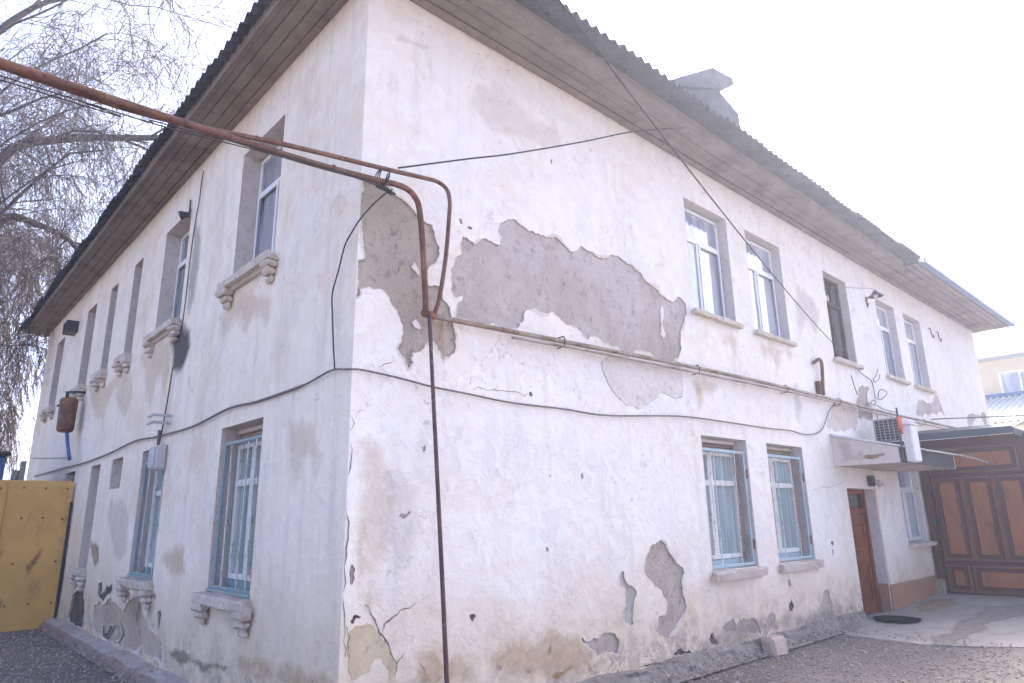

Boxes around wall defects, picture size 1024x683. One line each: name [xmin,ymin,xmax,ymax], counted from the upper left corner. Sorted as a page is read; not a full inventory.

spalling [356,180,687,371]
spalling [916,393,945,417]
spalling [67,579,164,668]
peeling [348,615,397,681]
crack [343,514,442,682]
spalling [582,632,620,657]
spalling [618,570,637,626]
spalling [644,539,687,639]